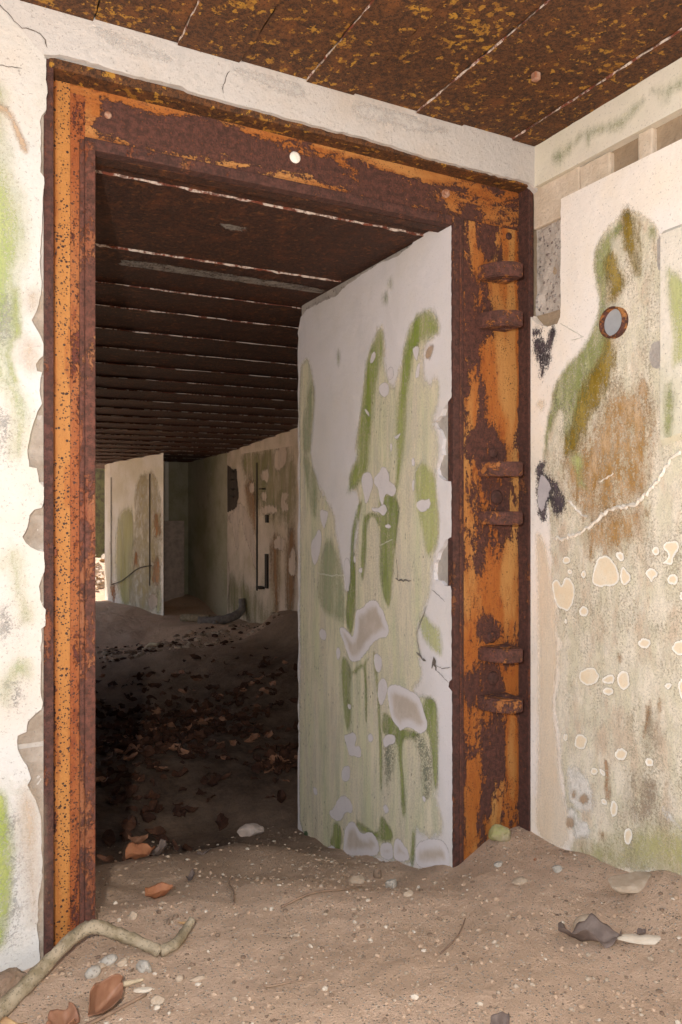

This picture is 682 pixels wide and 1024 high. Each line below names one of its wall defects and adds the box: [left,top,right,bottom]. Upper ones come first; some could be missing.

spalling [32,291,44,341]
spalling [536,220,561,316]
spalling [27,357,44,482]
spalling [23,506,44,550]
rust [270,527,295,612]
damp [299,311,442,861]
peeling [552,551,631,625]
damp [532,213,682,876]
rust [563,379,654,558]
crack [553,450,682,542]
peeling [336,600,427,781]
peeling [328,796,449,868]